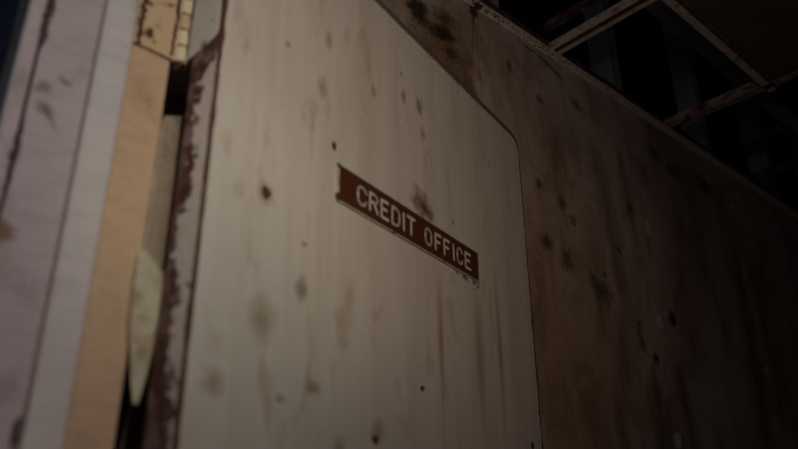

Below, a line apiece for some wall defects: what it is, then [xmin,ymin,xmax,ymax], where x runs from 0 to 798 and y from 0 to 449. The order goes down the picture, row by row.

corrosion [133,0,222,449]
mould [407,0,464,74]